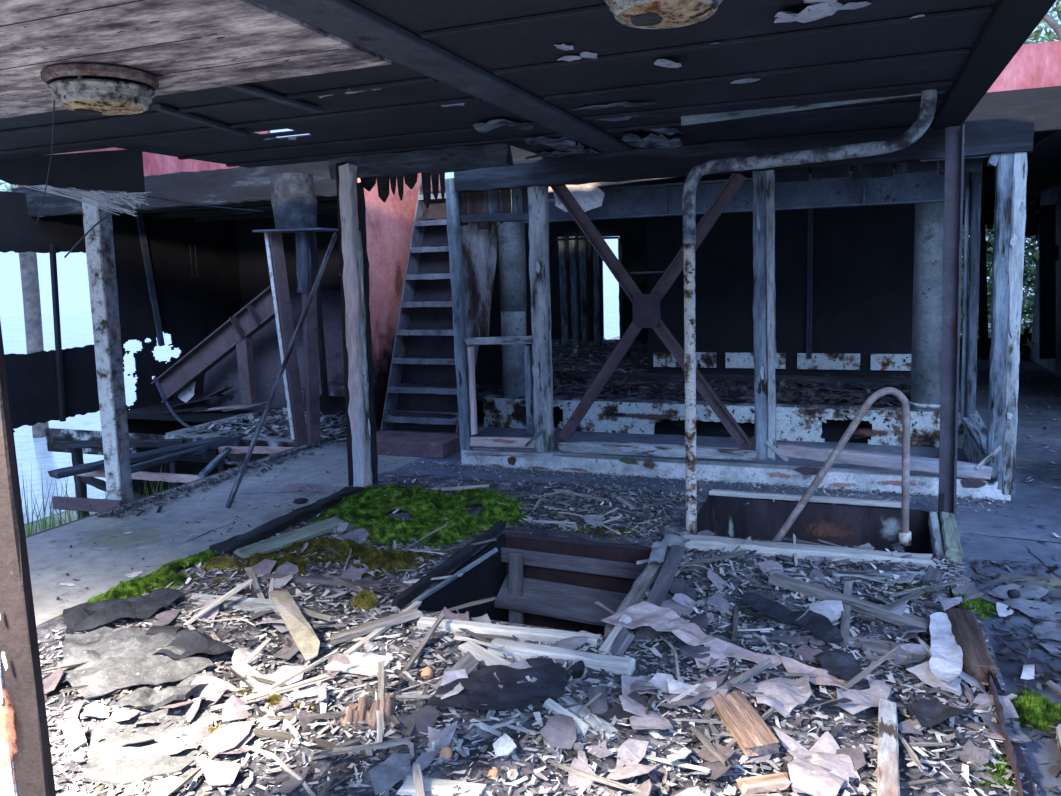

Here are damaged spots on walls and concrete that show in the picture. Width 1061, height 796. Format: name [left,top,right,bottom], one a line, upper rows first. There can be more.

peeling [774,0,871,23]
peeling [554,44,598,62]
peeling [654,59,682,68]
rust [613,413,684,426]
crack [968,533,1061,579]
rust [0,699,14,751]